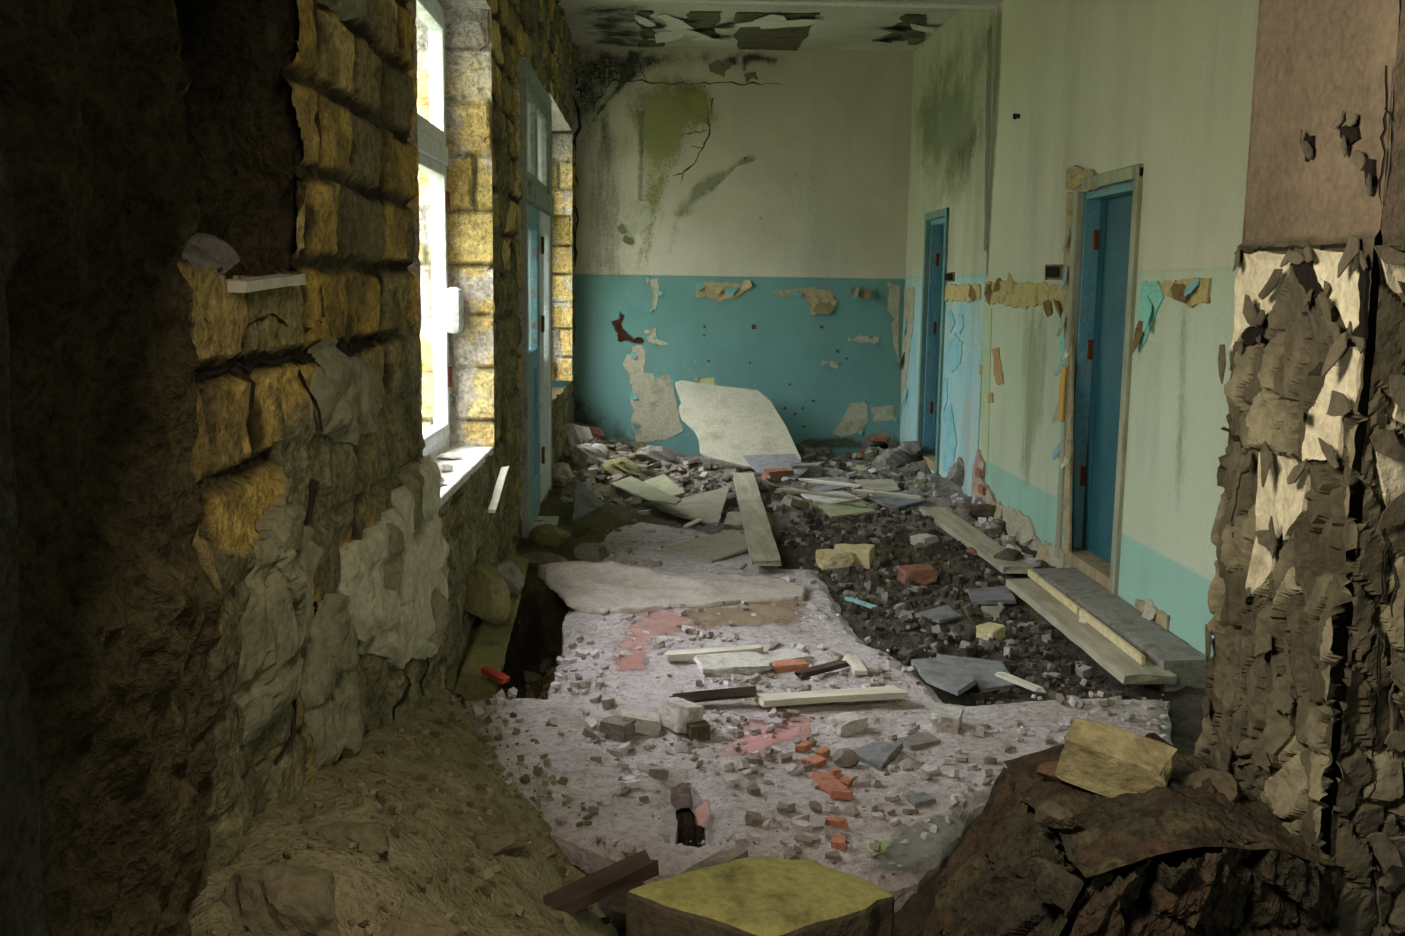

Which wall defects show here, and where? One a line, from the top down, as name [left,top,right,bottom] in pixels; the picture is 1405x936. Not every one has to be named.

damp [573,5,712,264]
crack [572,61,783,265]
peeling [617,10,824,82]
damp [726,54,776,70]
peeling [872,14,937,52]
crack [1379,65,1392,204]
peeling [622,277,683,442]
peeling [774,282,915,454]
spalling [941,165,1104,568]
peeling [1130,278,1212,357]
peeling [1218,235,1405,603]
flaking render [231,454,450,771]